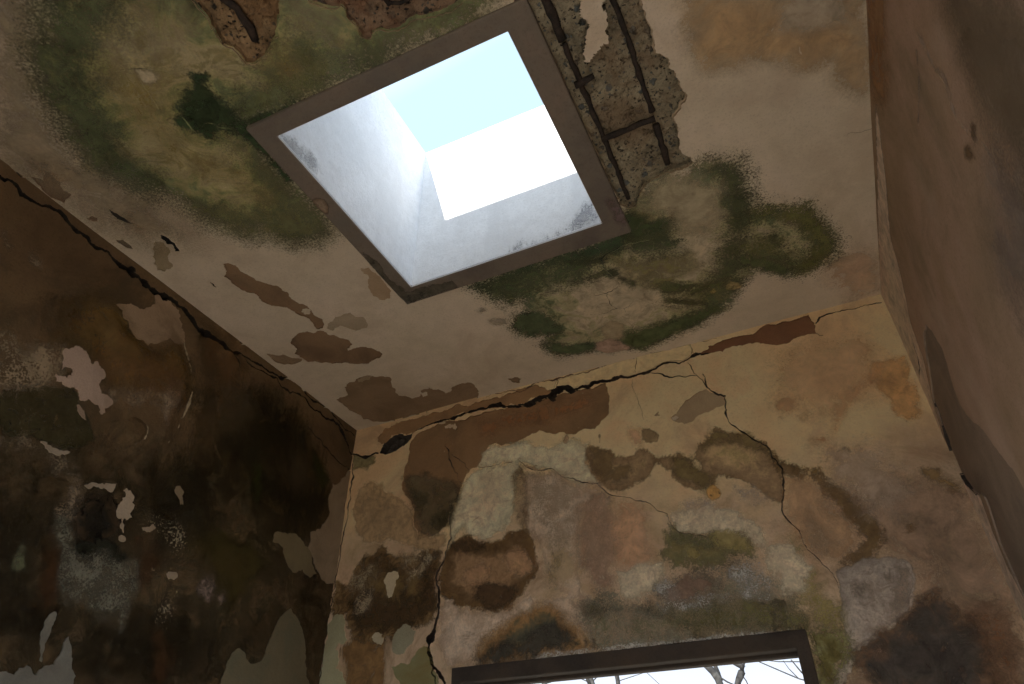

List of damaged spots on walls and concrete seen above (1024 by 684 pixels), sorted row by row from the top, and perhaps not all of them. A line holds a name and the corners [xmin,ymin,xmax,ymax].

spalling [192,0,281,66]
water stain [0,0,499,250]
spalling [308,0,463,40]
spalling [528,0,693,209]
crack [0,172,379,606]
peeling [223,263,610,537]
water stain [0,295,1024,684]
water stain [363,153,843,356]
crack [416,338,839,588]
peeling [701,315,816,356]
crack [816,302,882,336]
crack [426,516,452,684]